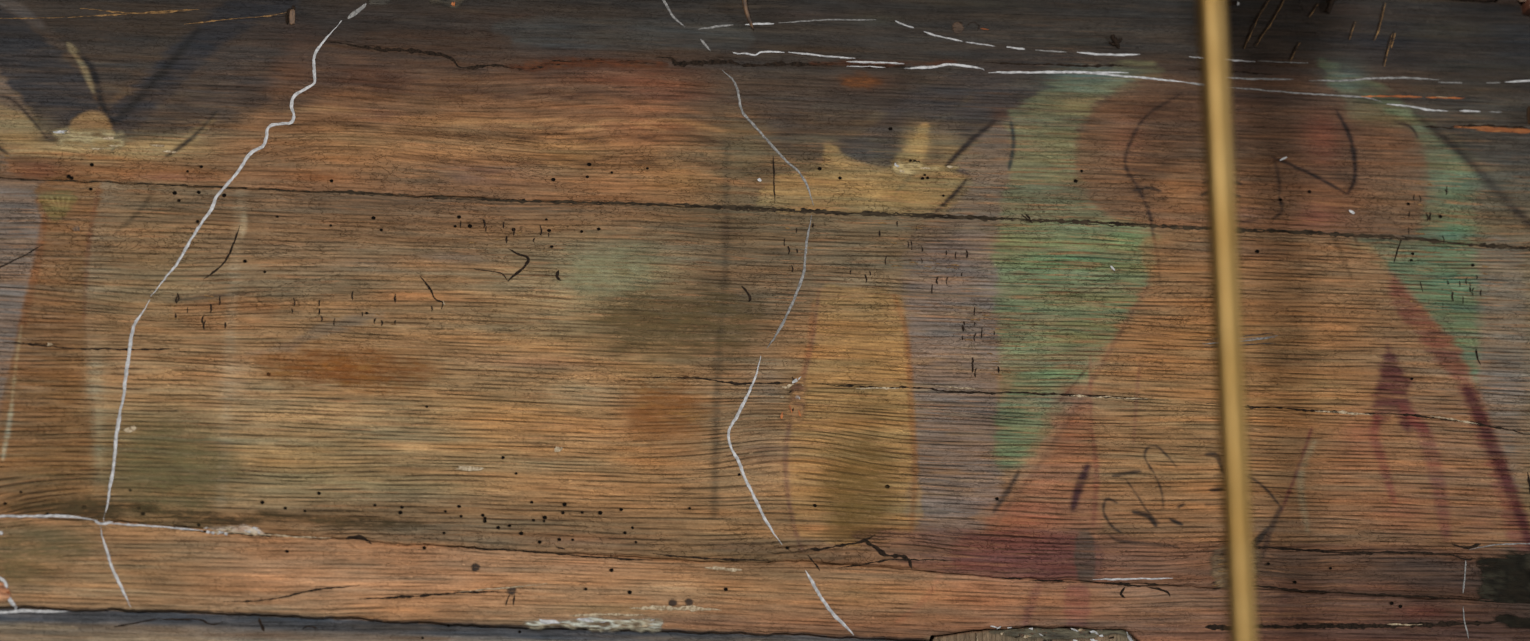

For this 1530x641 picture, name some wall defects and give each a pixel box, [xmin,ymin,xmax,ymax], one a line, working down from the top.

crack [1229,59,1530,113]
crack [1238,183,1530,303]
crack [0,0,1208,641]
crack [1206,333,1278,347]
crack [1207,403,1530,435]
crack [1205,543,1530,639]